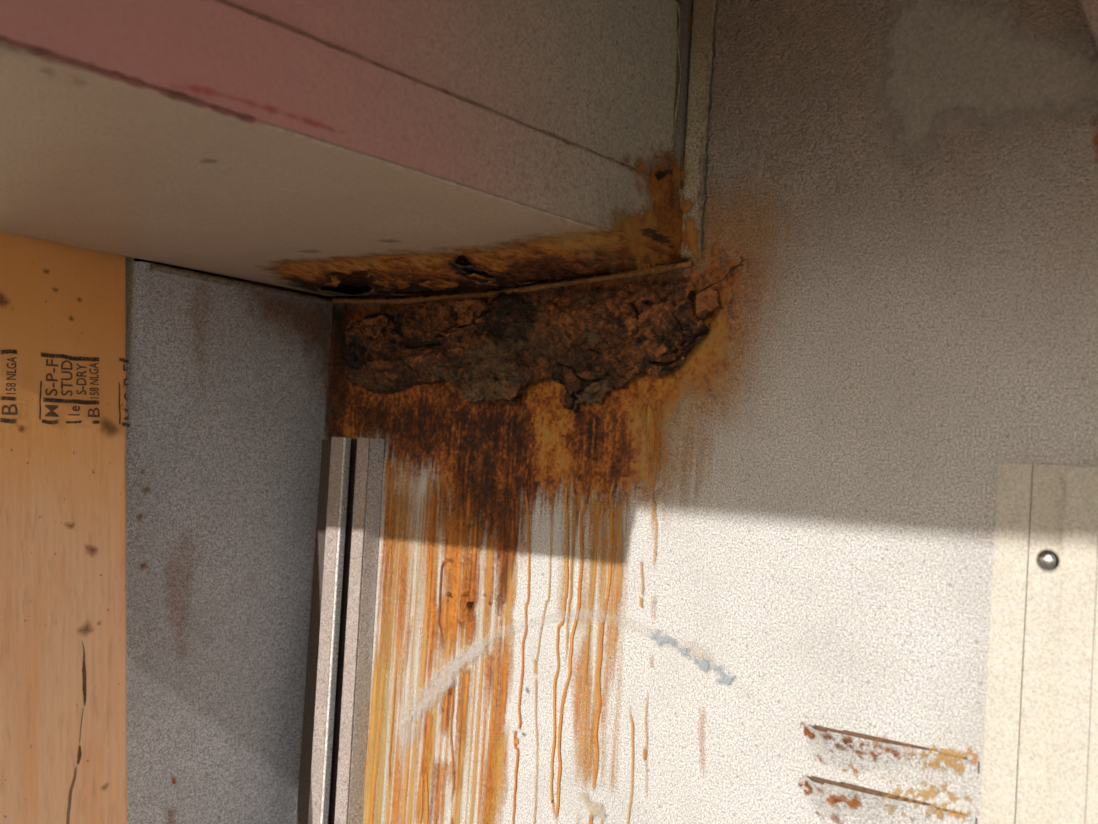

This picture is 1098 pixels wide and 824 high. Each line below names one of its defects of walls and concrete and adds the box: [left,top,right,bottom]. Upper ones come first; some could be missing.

peeling [695,287,720,318]
corrosion [267,152,761,824]
corrosion [803,725,977,774]
corrosion [799,778,860,824]
corrosion [885,785,970,820]